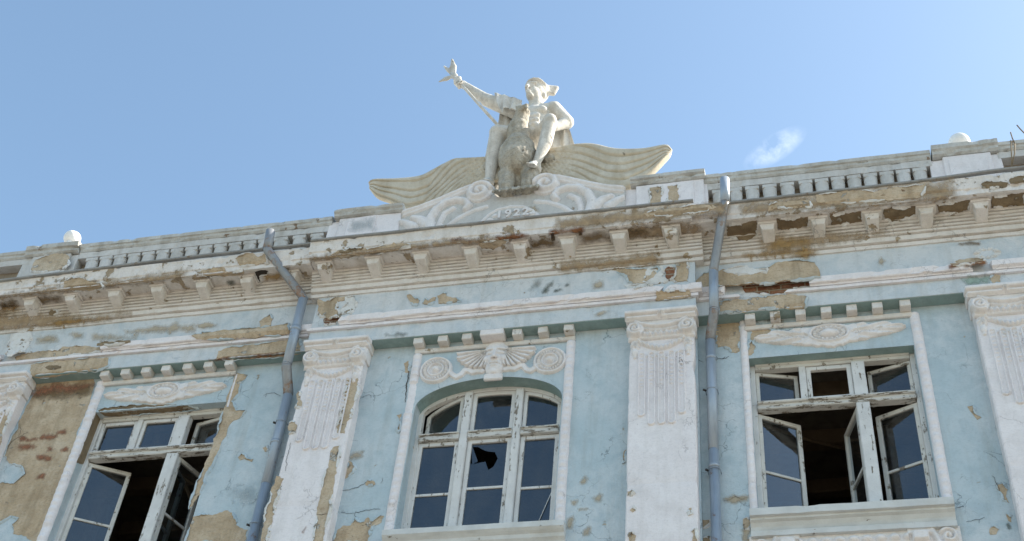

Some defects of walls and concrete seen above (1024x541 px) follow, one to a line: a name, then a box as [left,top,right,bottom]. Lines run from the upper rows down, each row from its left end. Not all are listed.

flaking render [317,295,358,327]
peeling [407,292,462,307]
flaking render [551,180,958,355]
peeling [981,174,1024,209]
flaking render [0,309,202,541]
flaking render [184,314,303,541]
flaking render [312,378,384,541]